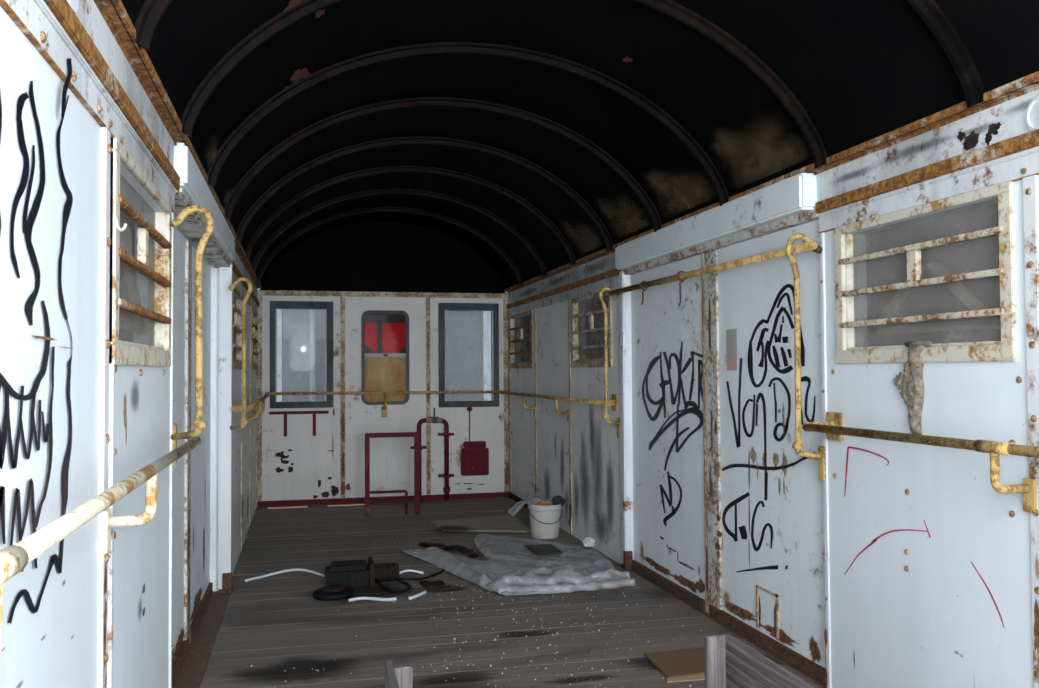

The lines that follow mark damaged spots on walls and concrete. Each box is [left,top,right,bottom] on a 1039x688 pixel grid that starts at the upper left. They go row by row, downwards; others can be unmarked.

rust [0,0,115,138]
water stain [716,132,793,178]
water stain [649,174,702,210]
rust [819,173,1039,233]
rust [702,297,711,354]
rust [704,379,717,446]
peeling [275,449,294,473]
peeling [313,477,351,499]
water stain [566,413,612,536]
rust [724,593,795,646]
rust [809,628,828,687]